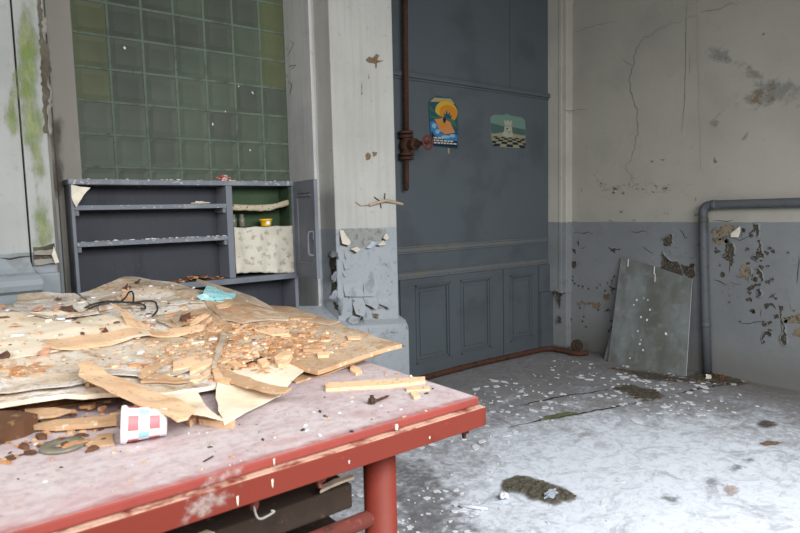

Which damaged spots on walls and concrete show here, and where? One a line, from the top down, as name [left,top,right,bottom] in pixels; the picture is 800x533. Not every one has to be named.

crack [622,3,739,182]
peeling [328,251,391,337]
peeling [660,232,697,278]
peeling [711,223,800,347]
crack [508,389,636,428]